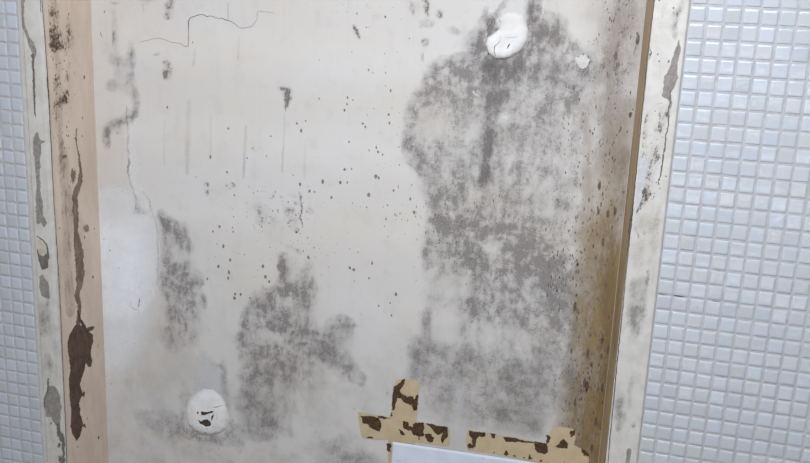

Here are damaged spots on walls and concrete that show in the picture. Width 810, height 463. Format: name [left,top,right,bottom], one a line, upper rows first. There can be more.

peeling [21,0,37,117]
crack [140,11,271,45]
peeling [662,40,681,108]
peeling [33,132,47,227]
peeling [37,236,50,298]
peeling [44,128,94,441]
damp [160,217,208,327]
damp [380,0,671,463]
damp [233,253,337,427]